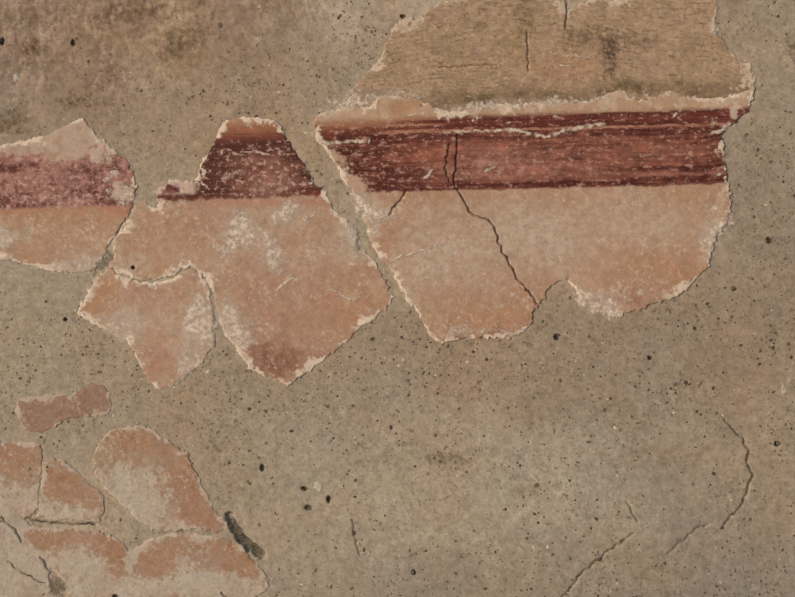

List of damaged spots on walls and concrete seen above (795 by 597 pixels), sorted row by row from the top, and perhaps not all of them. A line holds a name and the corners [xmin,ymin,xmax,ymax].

spalling [349,0,460,100]
peeling [103,170,134,205]
peeling [50,251,113,274]
peeling [212,209,292,280]
peeling [271,200,314,225]
peeling [349,192,395,236]
crack [444,139,536,302]
peeling [699,204,734,260]
peeling [574,285,621,321]
peeling [171,294,258,385]
spalling [230,519,262,555]
spalling [49,578,69,595]